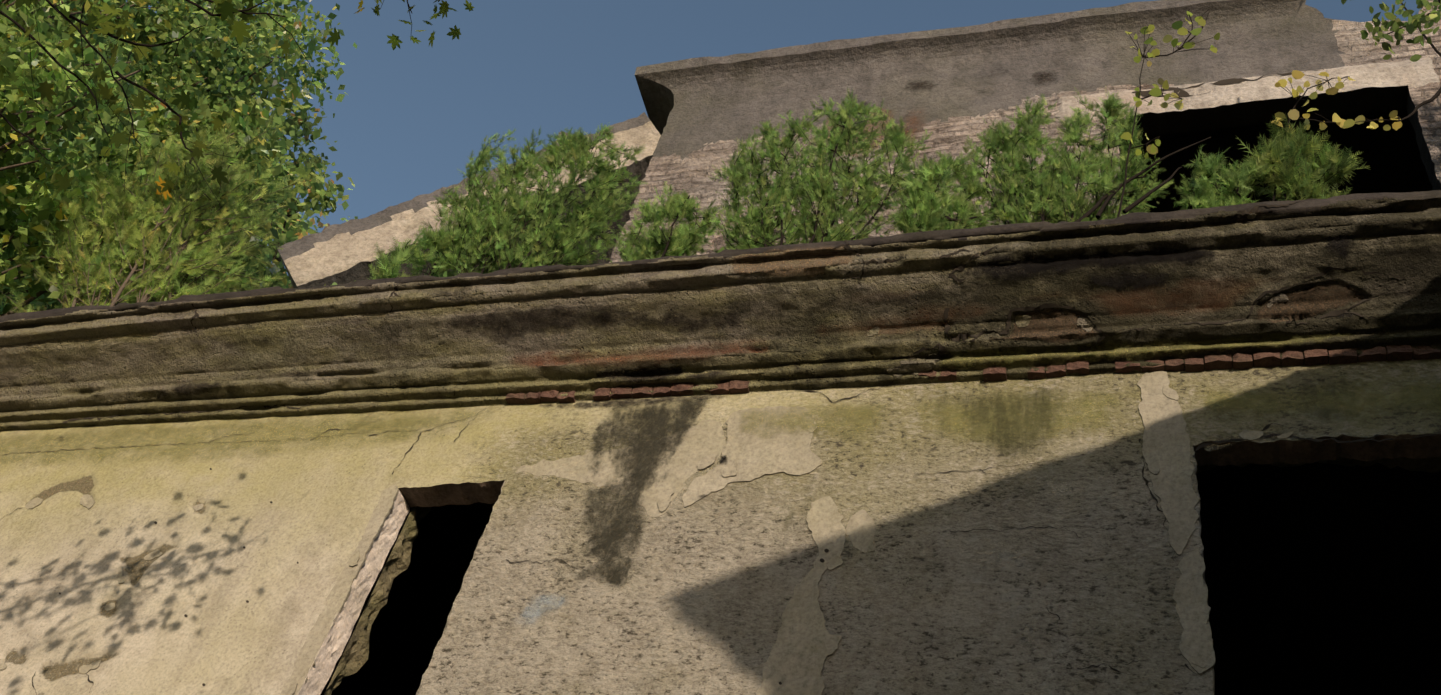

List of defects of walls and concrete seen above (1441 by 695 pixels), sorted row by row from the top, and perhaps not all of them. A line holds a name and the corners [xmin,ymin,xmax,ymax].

leakage [452,306,740,336]
leakage [596,365,725,381]
flaking render [983,366,1008,382]
flaking render [1027,361,1089,380]
flaking render [505,380,822,518]
spalling [7,476,95,515]
leakage [549,396,708,583]
flaking render [1115,345,1441,675]
spalling [116,544,173,586]
spalling [101,600,117,618]
flaking render [755,496,876,695]
spalling [0,649,117,695]